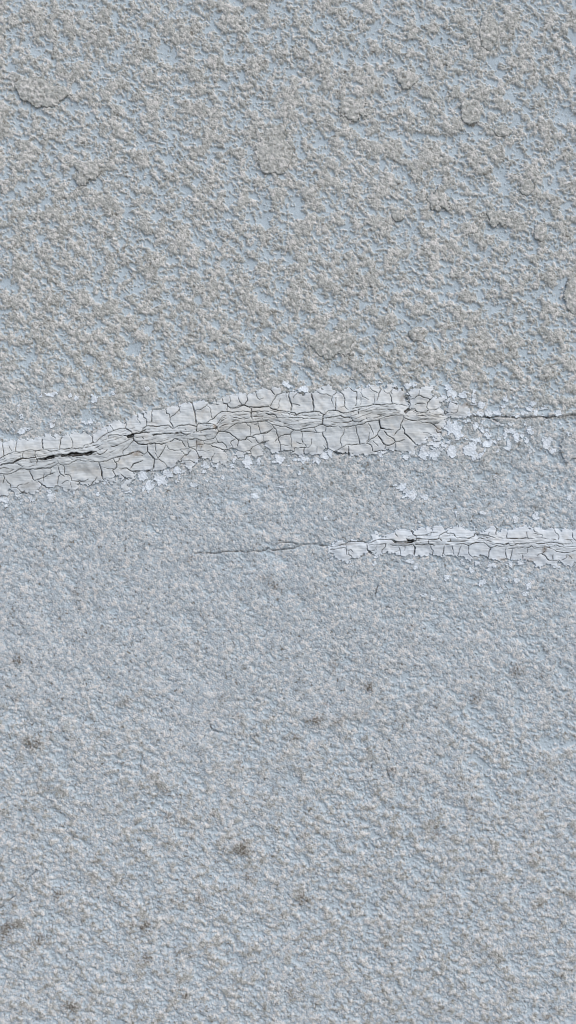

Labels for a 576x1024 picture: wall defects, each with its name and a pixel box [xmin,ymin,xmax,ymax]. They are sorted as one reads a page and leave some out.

peeling [0,380,572,508]
crack [458,406,571,422]
peeling [328,510,576,601]